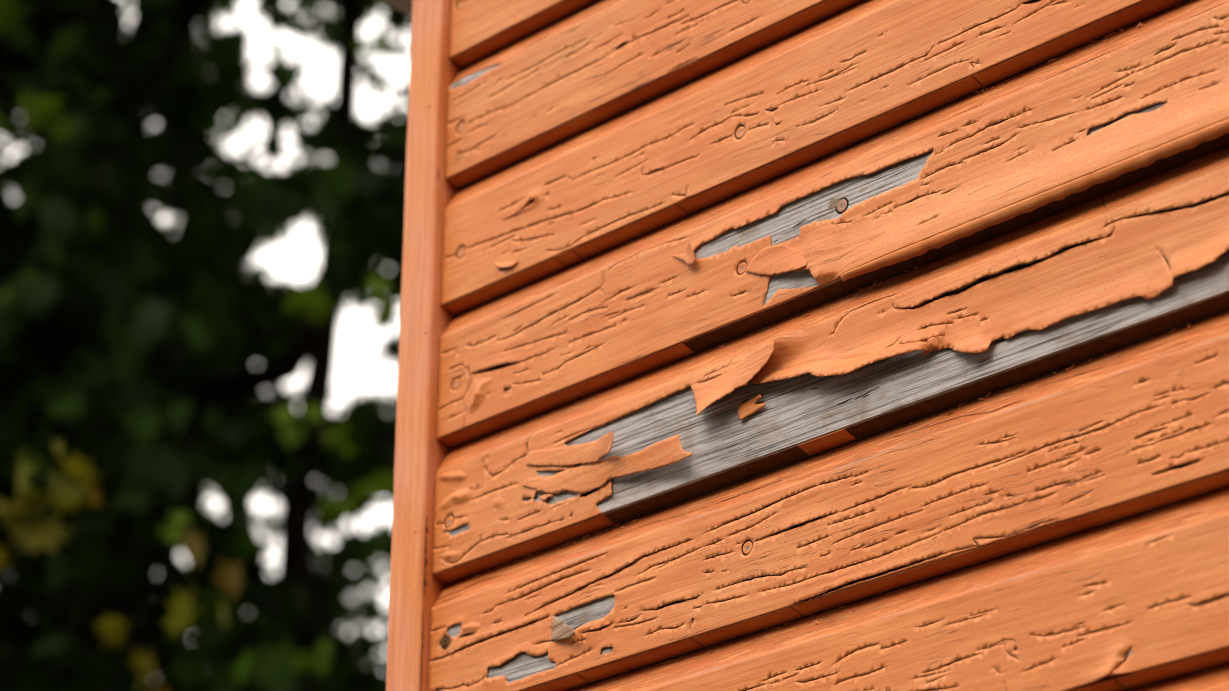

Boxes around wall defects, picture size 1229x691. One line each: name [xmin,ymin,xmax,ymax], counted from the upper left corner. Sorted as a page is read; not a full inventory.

crack [443,278,745,410]
crack [447,0,1066,258]
peeling [522,263,1229,515]
peeling [673,118,1229,303]
crack [842,193,1229,329]
crack [880,11,1227,209]
crack [431,357,1229,691]
peeling [487,652,556,683]
peeling [551,595,615,641]